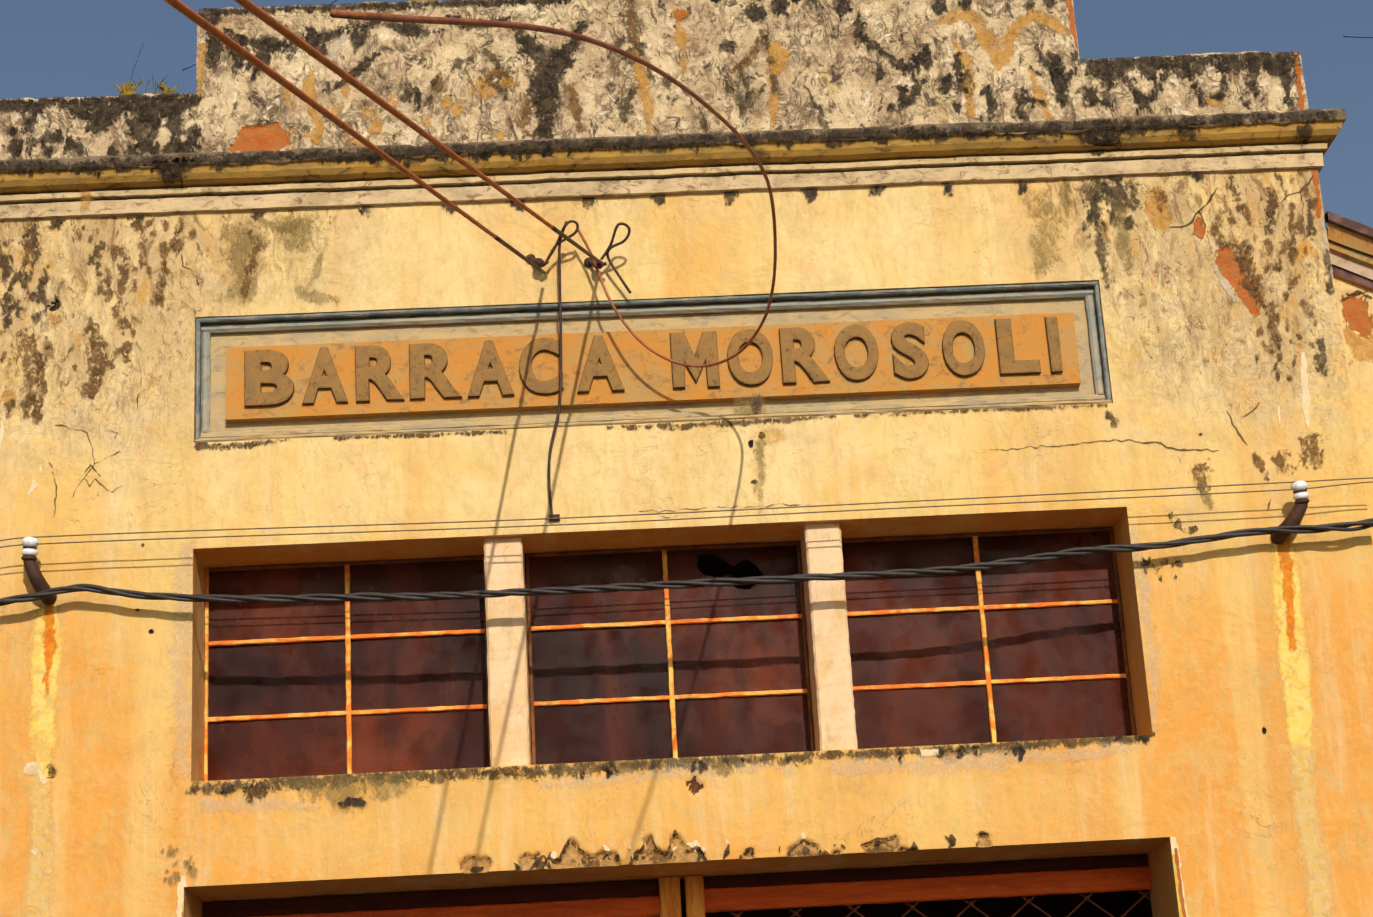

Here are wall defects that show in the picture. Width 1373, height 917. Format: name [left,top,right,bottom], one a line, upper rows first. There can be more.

spalling [229,122,291,152]
damp [0,0,1337,189]
damp [0,216,197,377]
damp [1210,169,1327,380]
spalling [1320,219,1373,365]
crack [49,377,144,517]
crack [977,402,1260,463]
corrosion [24,599,62,917]
damp [186,732,1155,808]
corrosion [1271,537,1332,917]
spalling [513,830,754,871]
spalling [779,832,918,857]